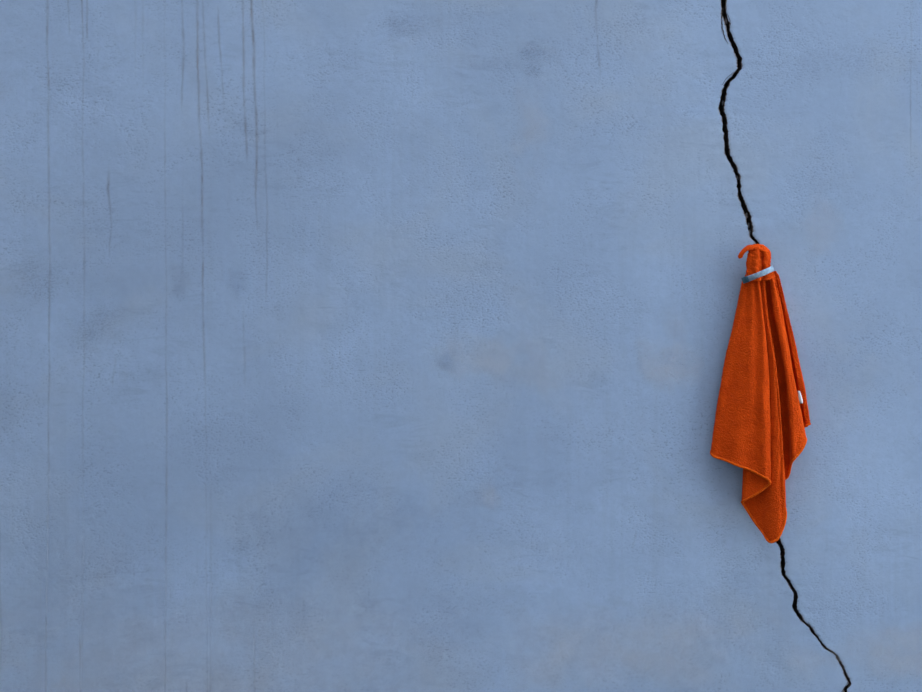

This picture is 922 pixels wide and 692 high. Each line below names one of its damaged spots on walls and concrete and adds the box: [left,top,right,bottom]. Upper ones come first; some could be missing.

crack [718,0,760,244]
crack [776,538,851,692]